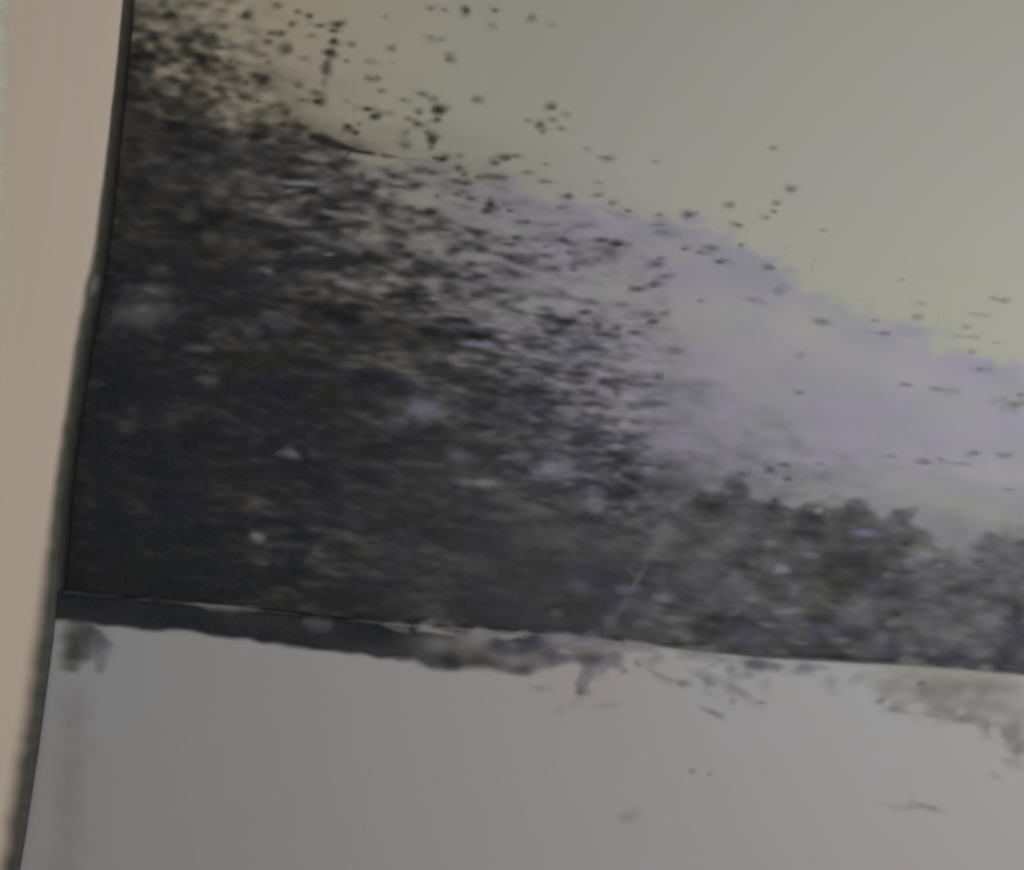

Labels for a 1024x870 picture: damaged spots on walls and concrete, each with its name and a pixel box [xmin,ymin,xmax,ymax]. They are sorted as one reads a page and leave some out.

leakage [56,11,1024,672]